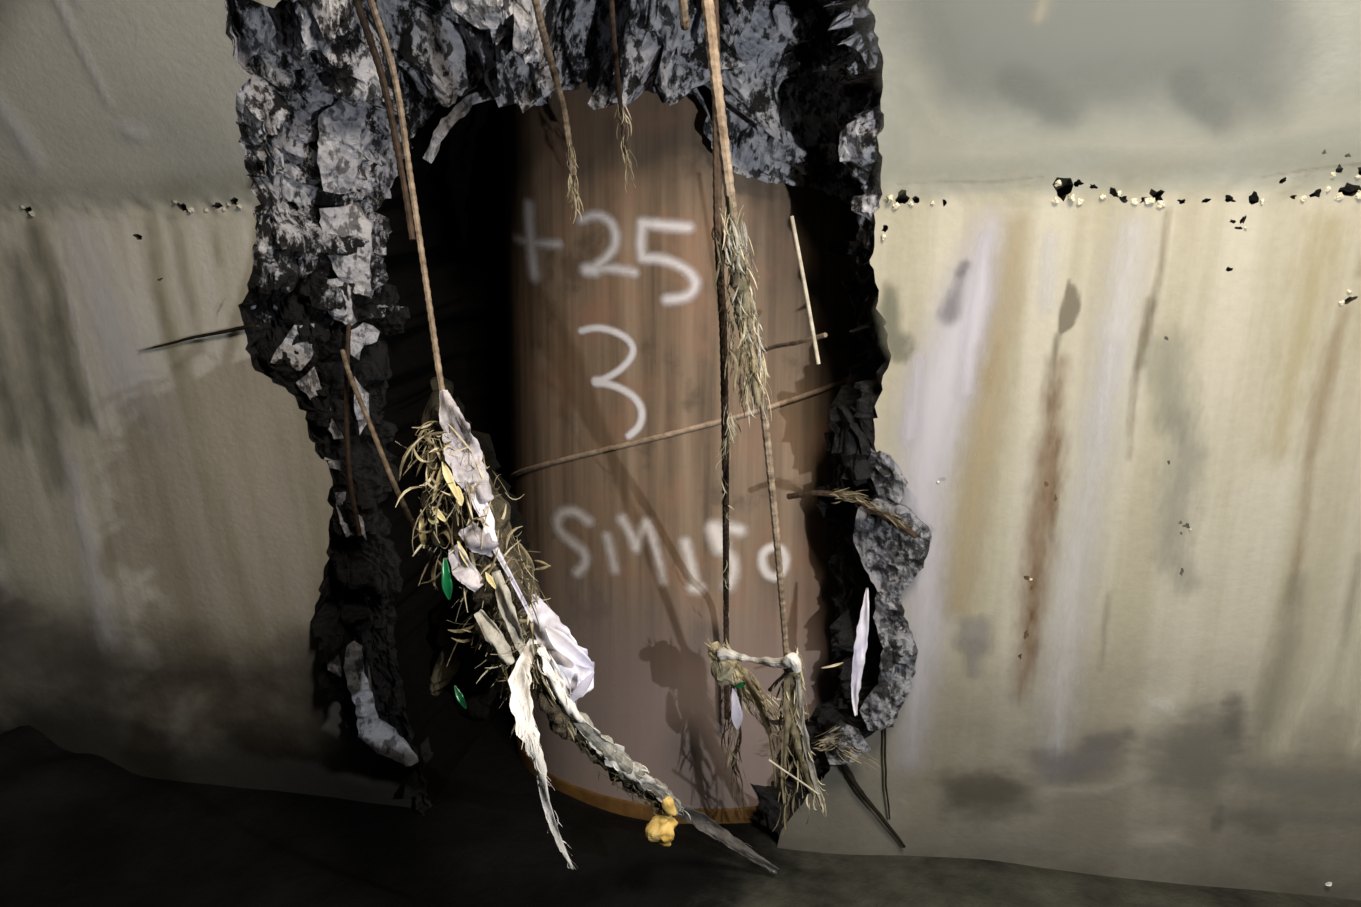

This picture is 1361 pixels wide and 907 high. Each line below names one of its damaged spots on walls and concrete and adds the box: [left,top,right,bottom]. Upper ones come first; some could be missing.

spalling [1051,177,1265,210]
spalling [1279,153,1361,203]
spalling [224,0,947,837]
leakage [884,289,907,357]
leakage [906,227,991,735]
corrosion [1026,433,1055,664]
leakage [1055,225,1139,722]